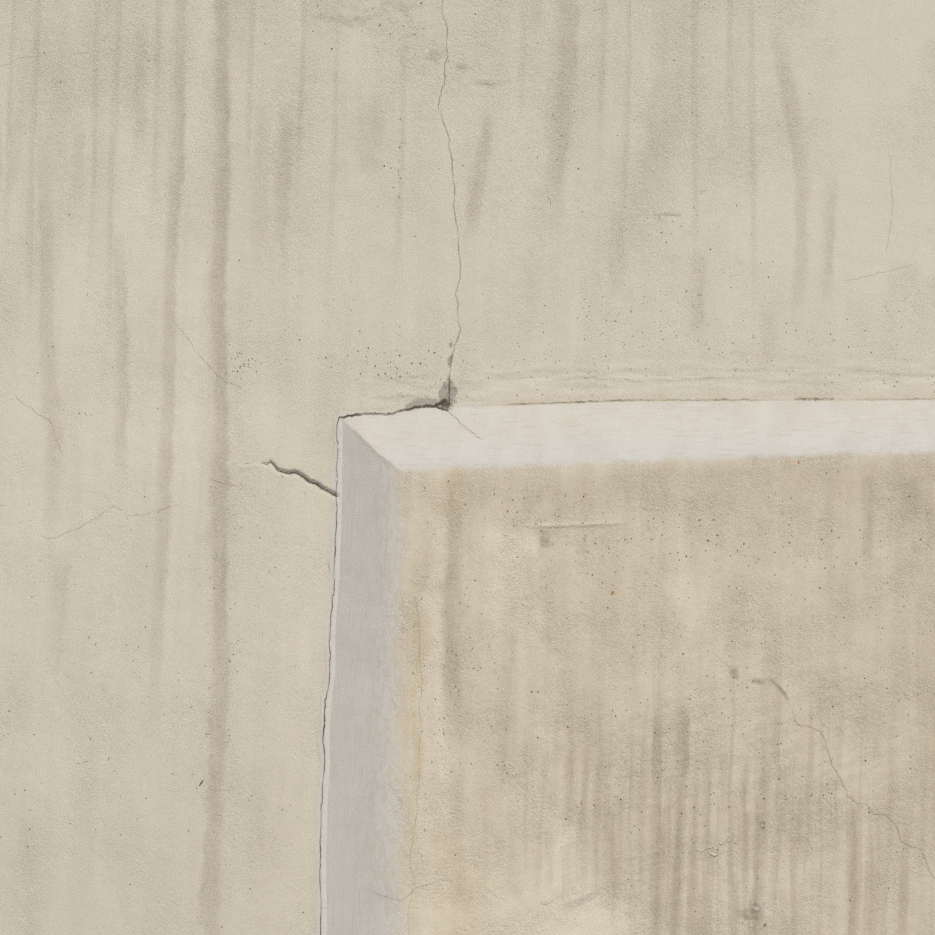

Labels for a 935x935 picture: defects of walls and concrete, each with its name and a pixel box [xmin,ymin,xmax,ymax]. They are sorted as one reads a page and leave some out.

crack [245,324,481,805]
crack [316,829,324,935]